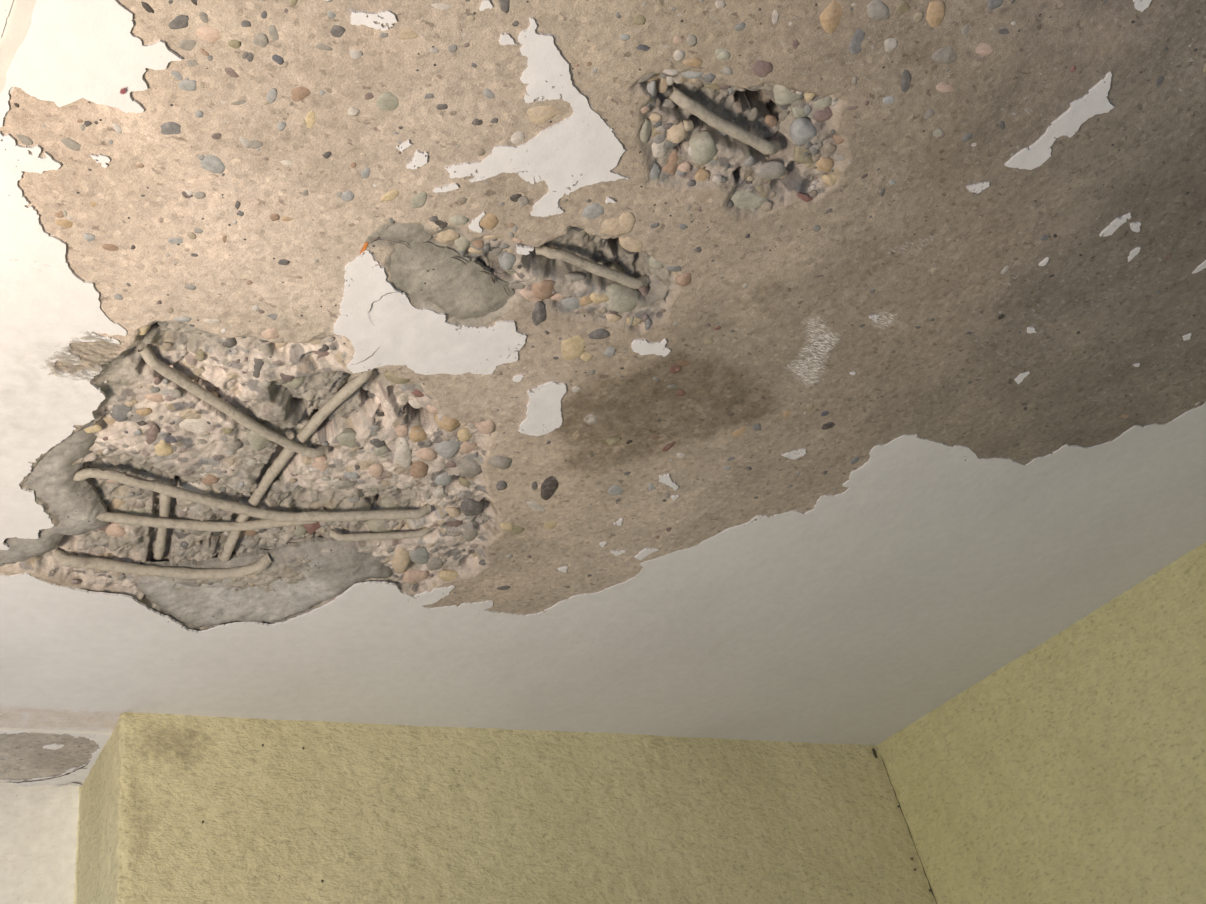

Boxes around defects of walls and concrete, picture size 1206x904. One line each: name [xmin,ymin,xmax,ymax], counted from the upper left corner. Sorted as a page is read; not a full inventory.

peeling [0,0,1206,631]
peeling [0,730,112,787]